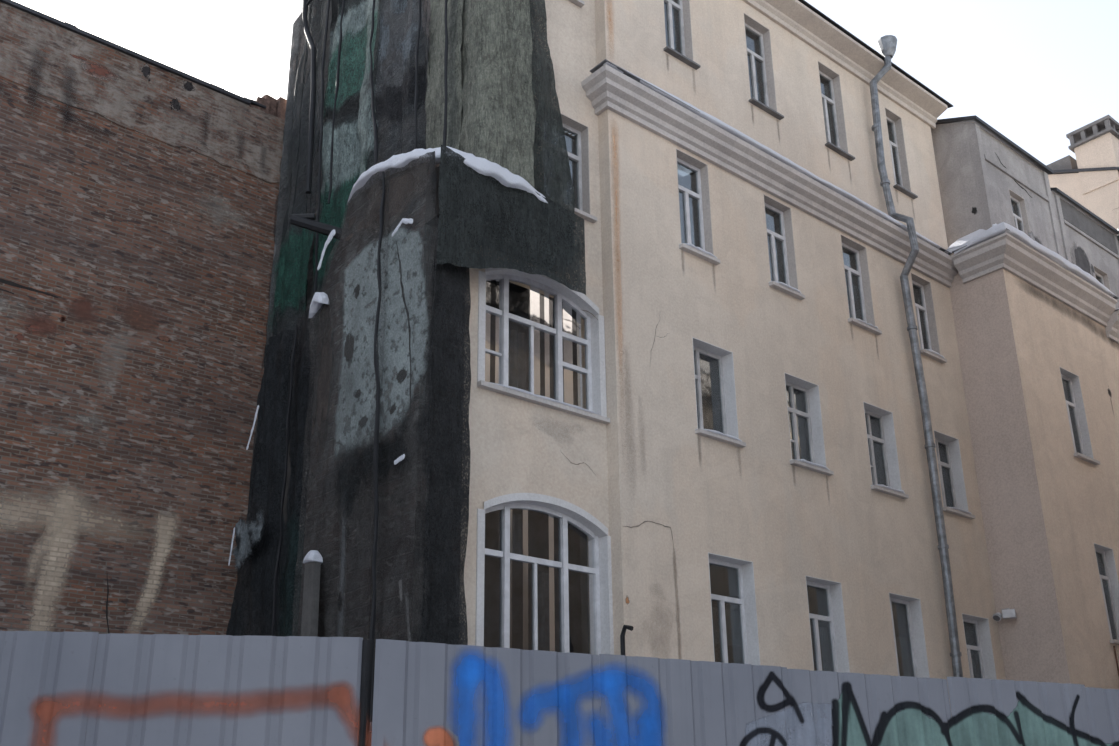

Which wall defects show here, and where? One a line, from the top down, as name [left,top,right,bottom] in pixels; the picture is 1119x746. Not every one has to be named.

crack [0,278,58,298]
crack [624,521,675,553]